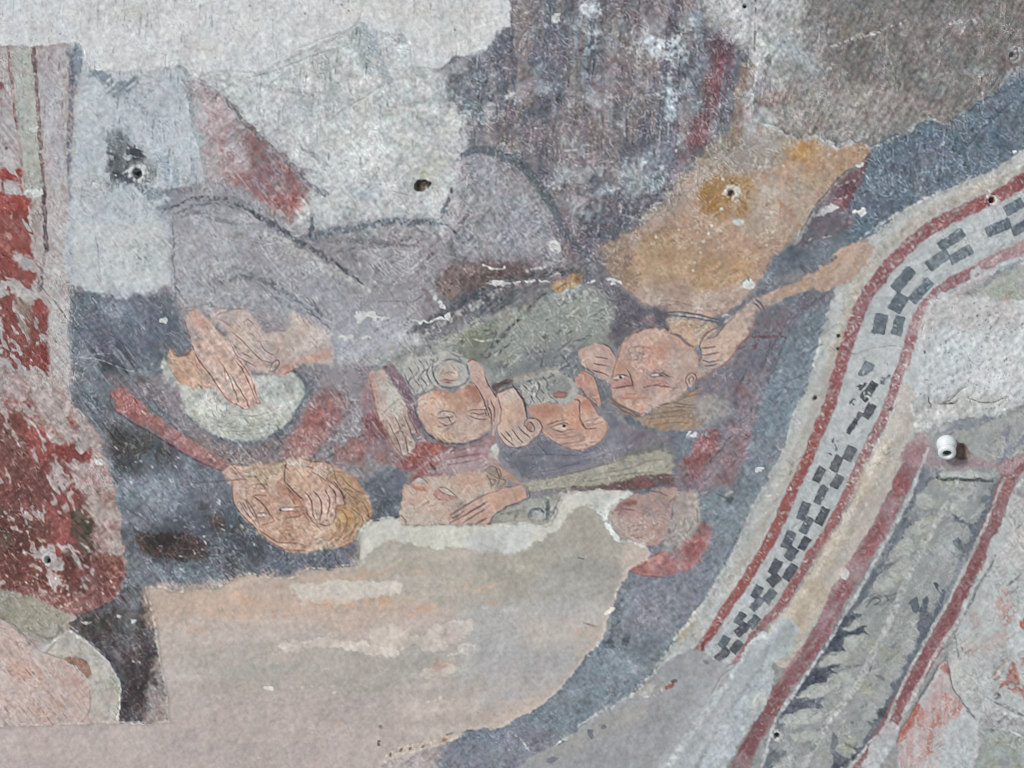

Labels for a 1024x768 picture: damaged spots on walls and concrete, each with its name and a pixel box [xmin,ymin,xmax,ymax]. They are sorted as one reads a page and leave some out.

flaking render [0,488,652,768]